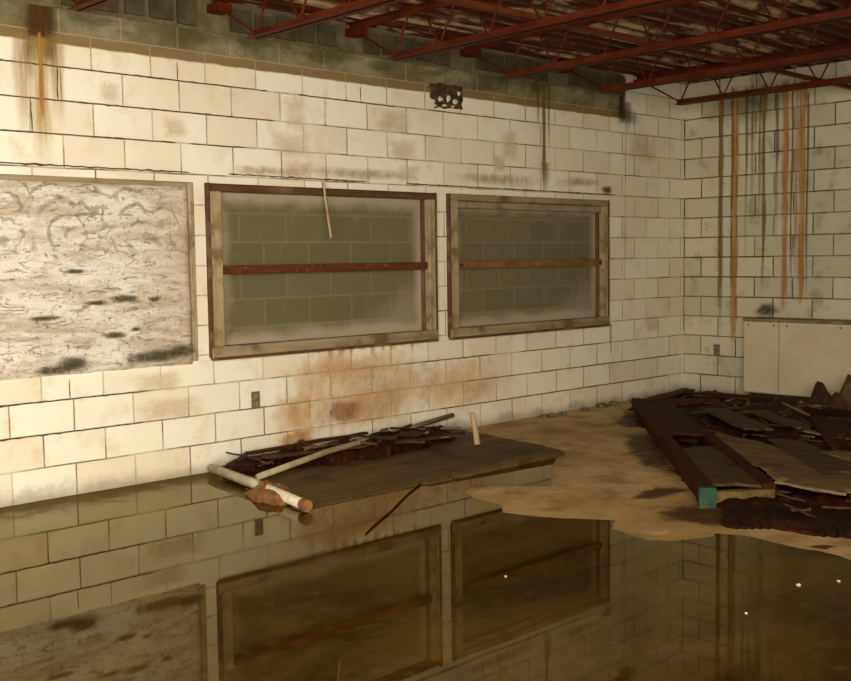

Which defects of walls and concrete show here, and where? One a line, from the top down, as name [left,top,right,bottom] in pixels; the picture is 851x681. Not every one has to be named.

corrosion [27,4,54,120]
corrosion [718,90,738,332]
damp [740,86,766,257]
corrosion [782,80,809,298]